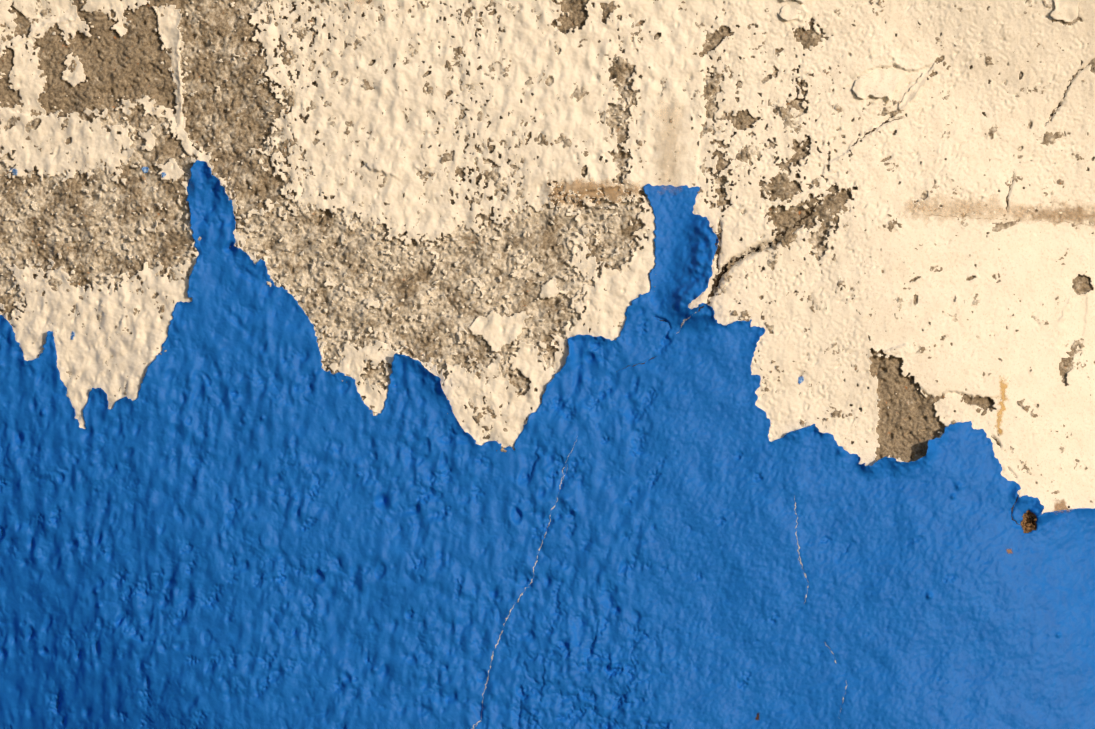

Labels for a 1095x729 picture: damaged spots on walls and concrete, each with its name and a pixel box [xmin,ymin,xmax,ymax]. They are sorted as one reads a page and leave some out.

spalling [0,0,672,452]
crack [660,200,822,334]
crack [1046,68,1094,123]
crack [472,436,578,729]